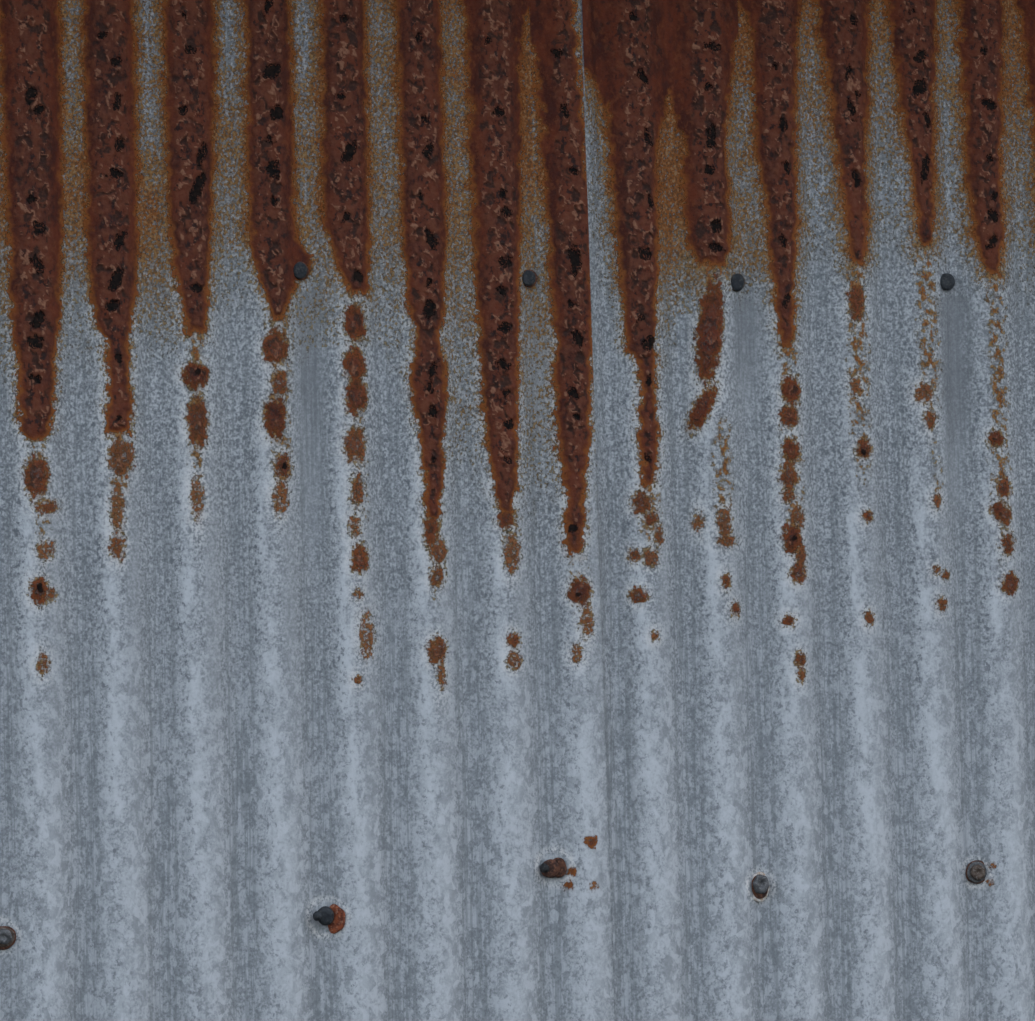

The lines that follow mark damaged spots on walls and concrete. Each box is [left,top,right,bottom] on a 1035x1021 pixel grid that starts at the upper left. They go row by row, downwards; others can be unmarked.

rust [0,0,1035,671]
rust [36,652,51,679]
rust [424,632,449,691]
rust [793,648,808,685]
rust [583,835,598,849]
rust [563,867,577,892]